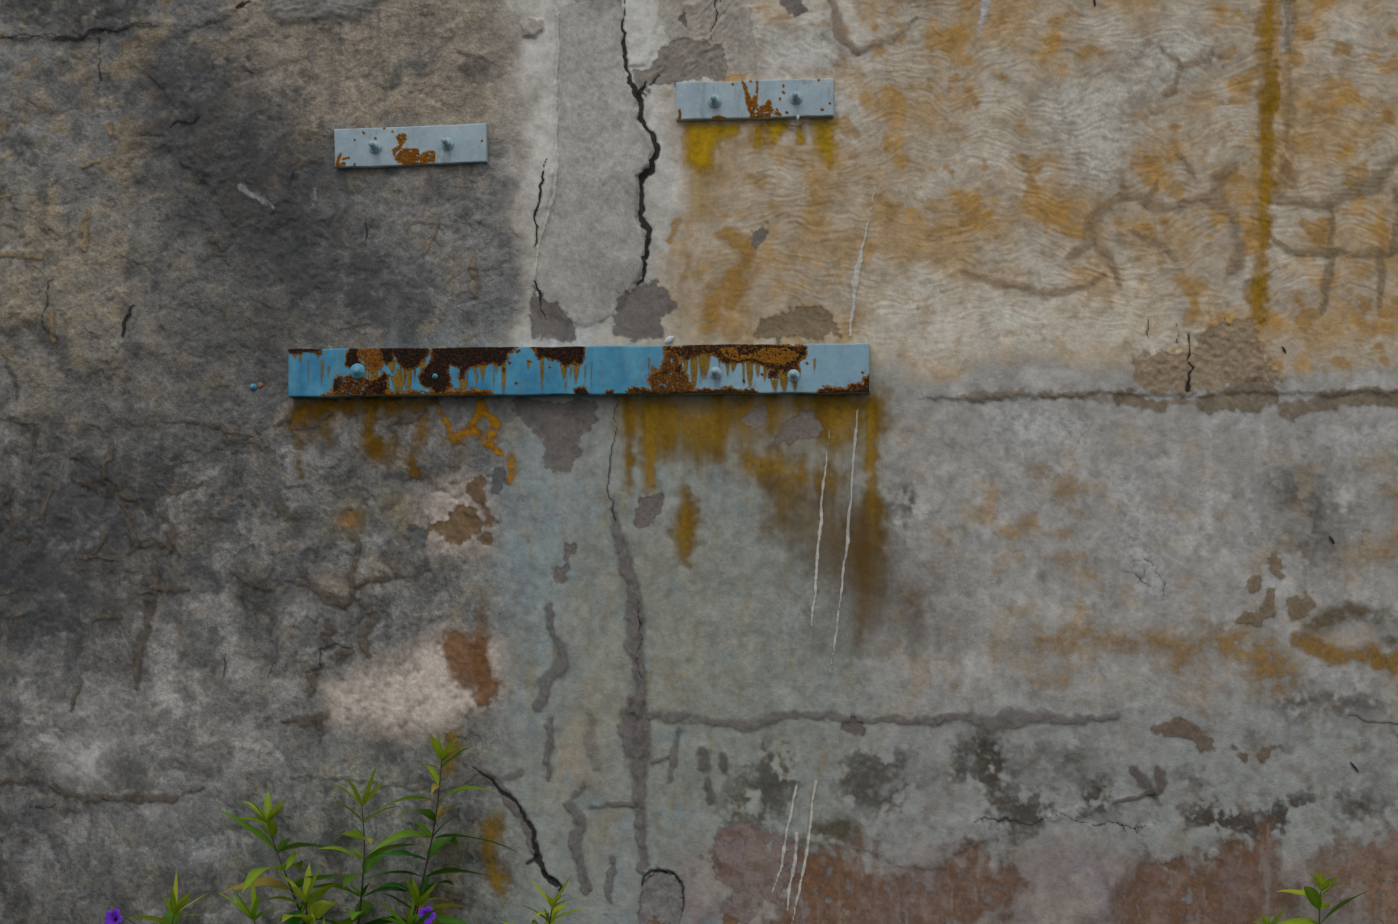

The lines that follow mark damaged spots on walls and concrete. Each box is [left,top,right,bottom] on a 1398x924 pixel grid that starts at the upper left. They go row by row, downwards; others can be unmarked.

rust [335,128,436,168]
crack [621,0,660,285]
rust [678,80,834,169]
crack [533,153,551,320]
rust [288,228,884,537]
rust [676,488,699,559]
damp [810,433,830,640]
damp [830,410,858,672]
crack [290,404,1118,912]
damp [753,753,851,924]
peeling [702,820,1027,924]
damp [1185,794,1312,839]